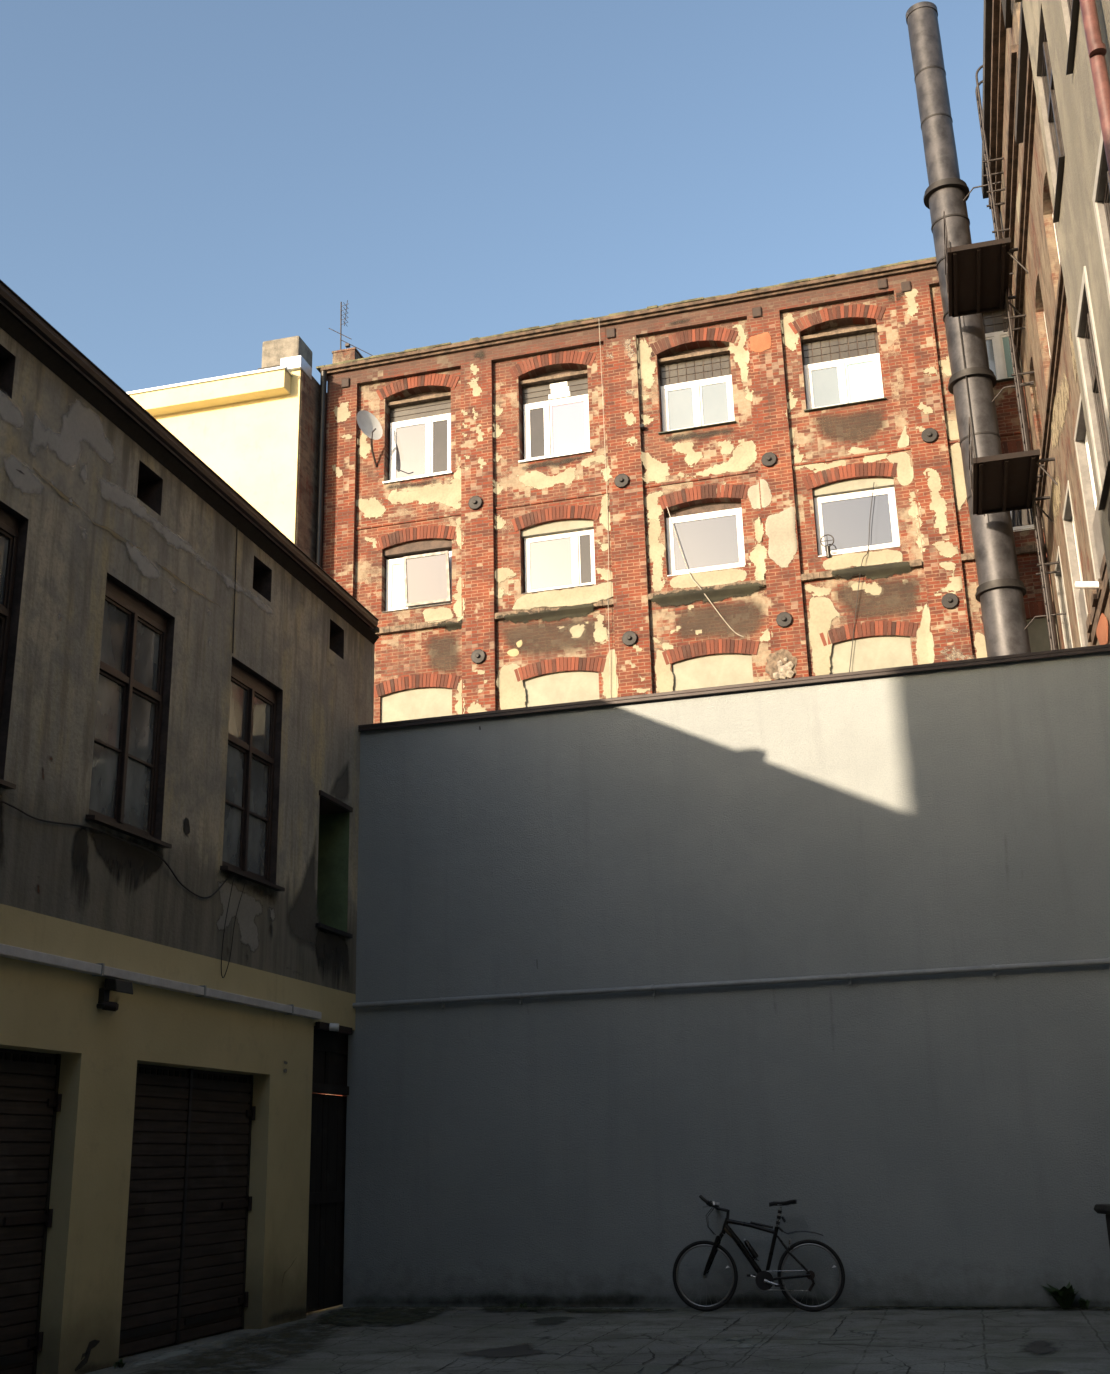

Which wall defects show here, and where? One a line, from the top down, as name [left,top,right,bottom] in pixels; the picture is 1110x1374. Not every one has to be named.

peeling [461,405,503,437]
peeling [626,390,654,446]
peeling [717,439,734,455]
peeling [897,425,925,448]
peeling [945,420,959,440]
peeling [494,515,506,530]
peeling [915,518,965,596]
spalling [760,629,797,680]
water stain [72,827,163,899]
water stain [270,846,349,986]
crack [75,1340,100,1371]
crack [529,1311,789,1374]